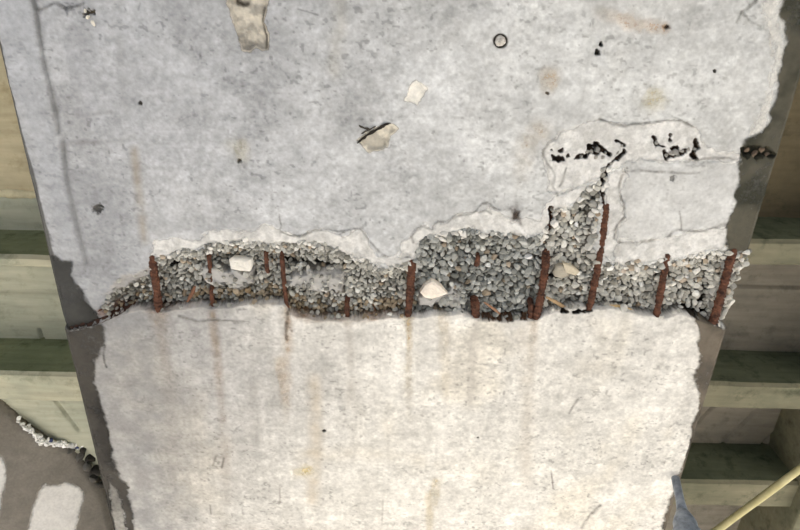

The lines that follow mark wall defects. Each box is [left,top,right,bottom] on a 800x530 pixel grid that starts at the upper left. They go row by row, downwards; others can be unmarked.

spalling [226,0,269,53]
spalling [404,80,427,105]
spalling [101,120,752,327]